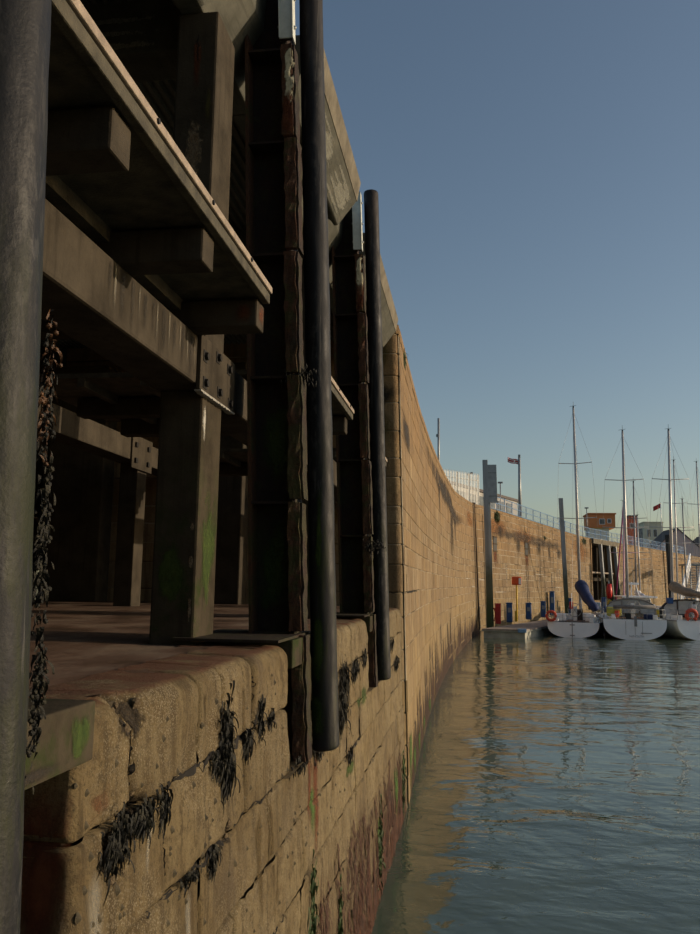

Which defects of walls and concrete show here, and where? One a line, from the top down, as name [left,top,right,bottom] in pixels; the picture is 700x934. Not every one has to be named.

water stain [432,464,458,540]
rust [307,758,319,835]
water stain [336,615,479,934]